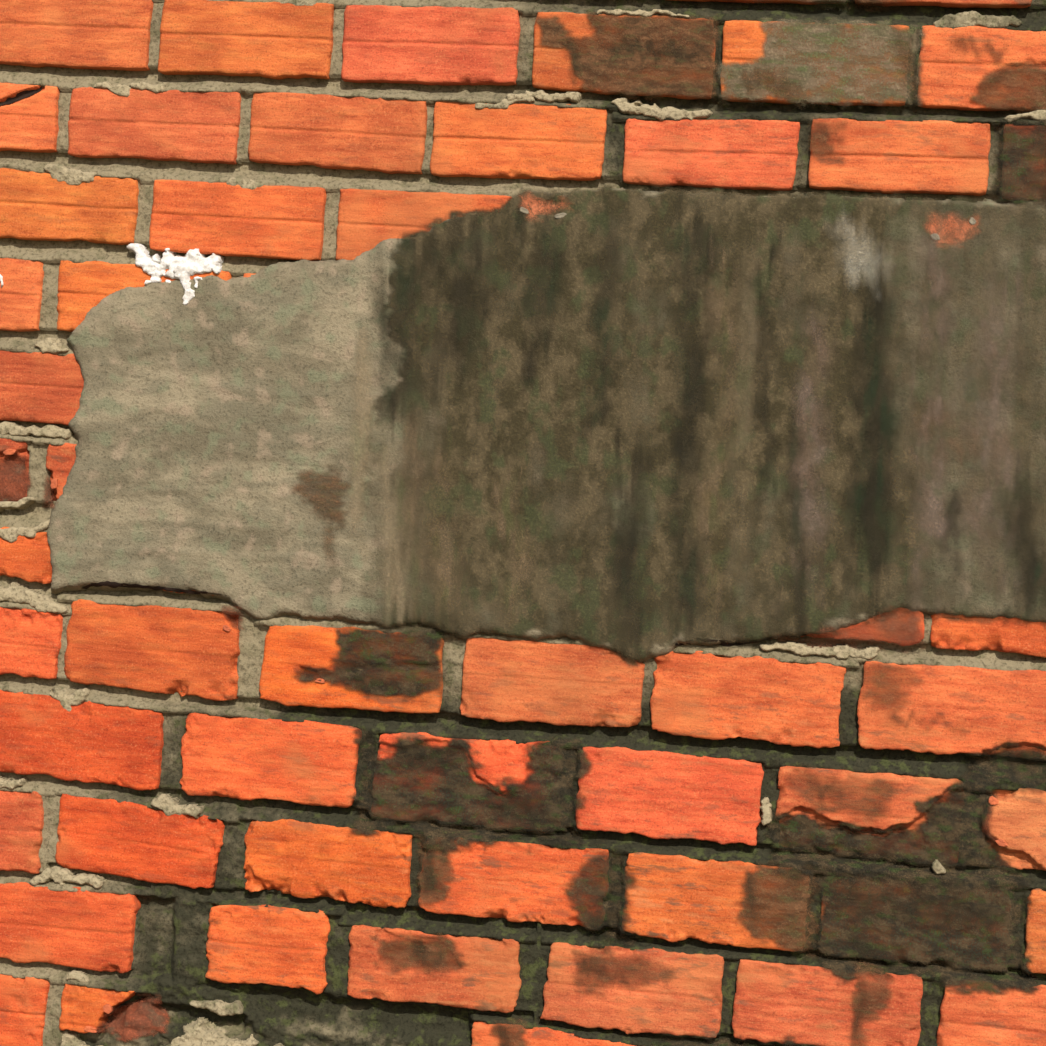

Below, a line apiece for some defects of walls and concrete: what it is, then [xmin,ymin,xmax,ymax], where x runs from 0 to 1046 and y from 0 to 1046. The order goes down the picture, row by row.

crack [0,86,43,106]
damp [536,12,719,101]
damp [295,62,1046,665]
damp [739,864,818,953]
spalling [84,997,169,1042]